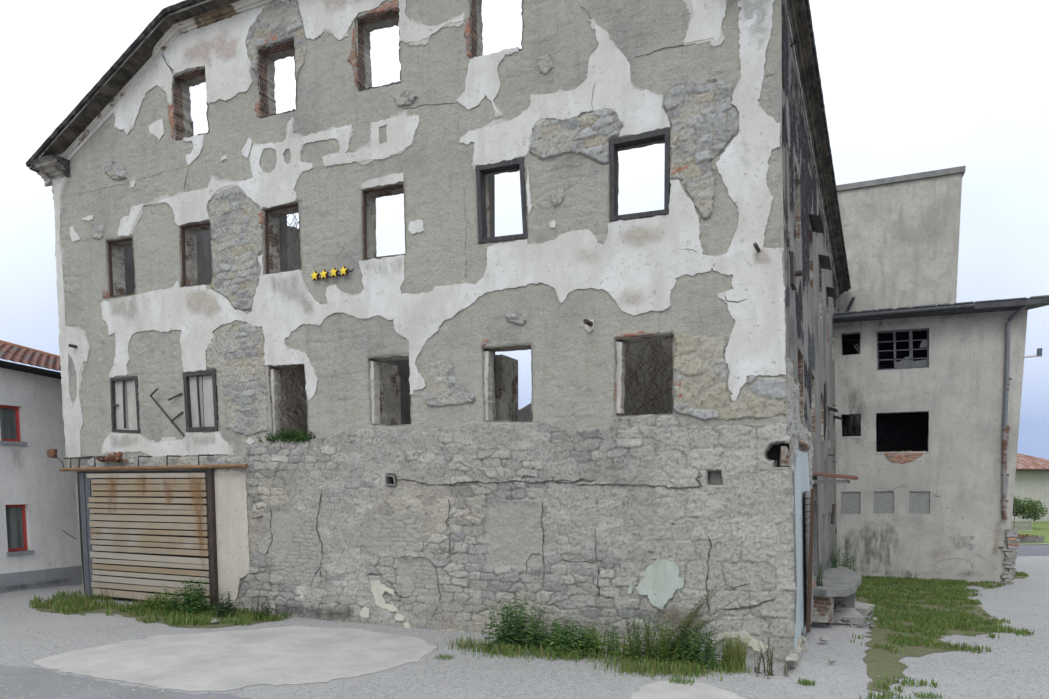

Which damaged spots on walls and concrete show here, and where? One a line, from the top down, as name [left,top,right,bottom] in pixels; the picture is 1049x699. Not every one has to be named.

spalling [52,0,827,669]
flaking render [884,451,925,464]
crack [311,492,323,584]
crack [387,473,702,617]